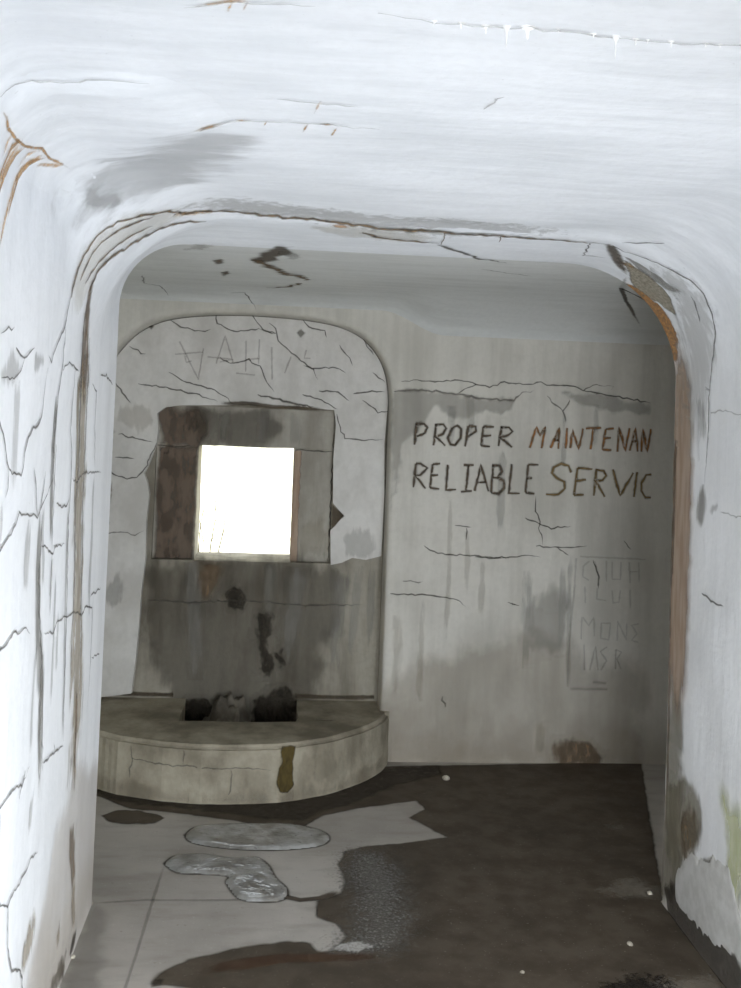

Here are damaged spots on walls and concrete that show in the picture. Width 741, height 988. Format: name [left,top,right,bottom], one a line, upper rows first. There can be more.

corrosion [0,120,62,211]
spalling [607,245,678,362]
crack [0,210,716,695]
water stain [290,450,301,562]
crack [123,690,173,698]
water stain [185,699,212,721]
water stain [251,686,297,722]
crack [0,721,64,809]
corrosion [277,745,295,793]
crack [0,853,37,908]
water stain [51,828,76,988]
water stain [96,741,741,988]